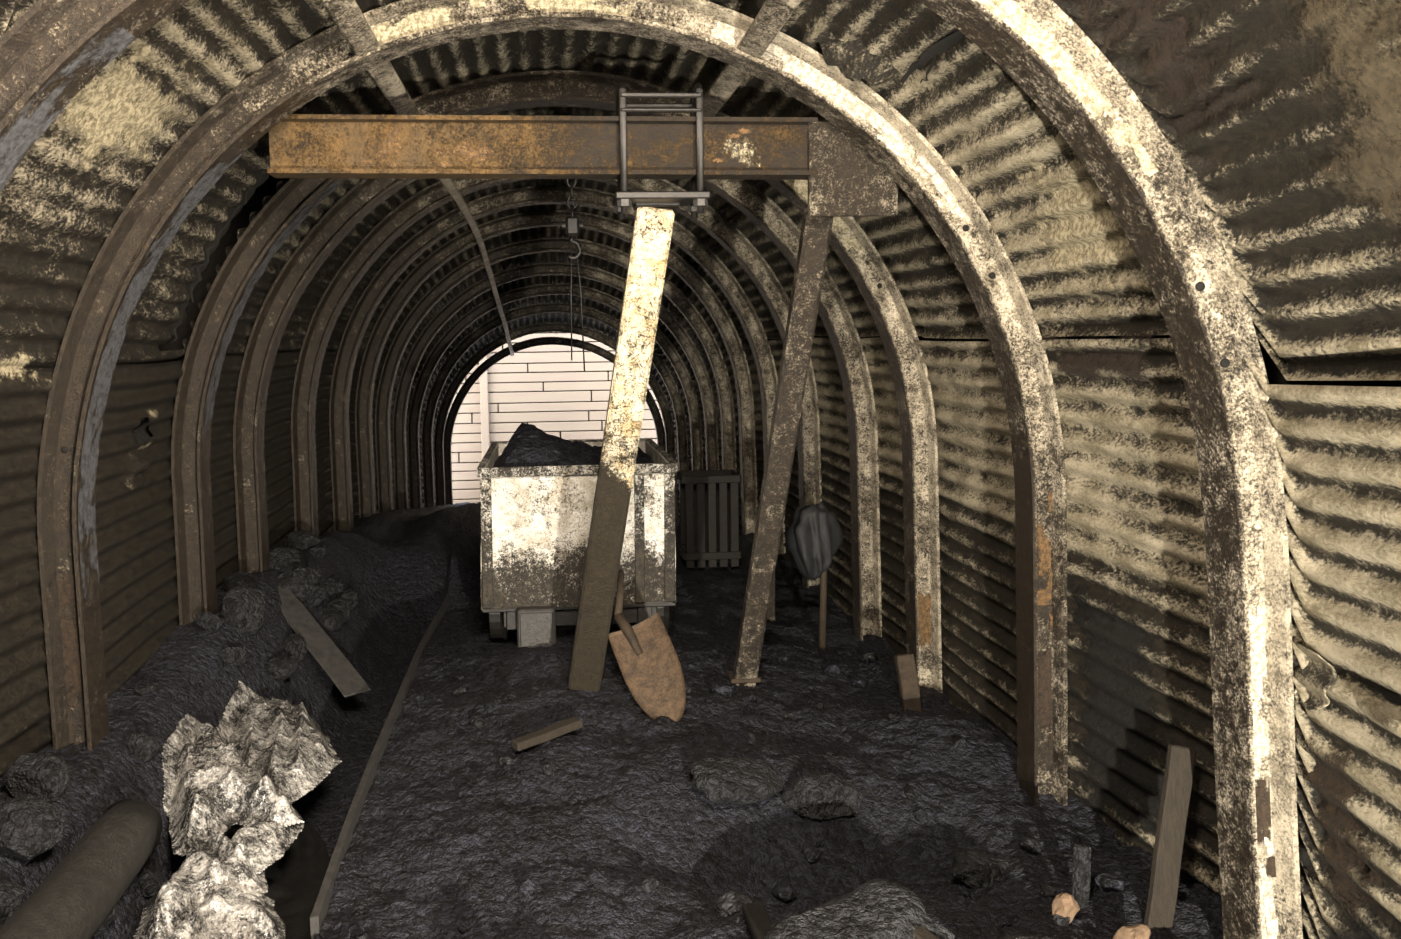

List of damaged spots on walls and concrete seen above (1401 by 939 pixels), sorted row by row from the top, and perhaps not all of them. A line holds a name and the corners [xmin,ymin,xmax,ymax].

corrosion [436,137,502,168]
corrosion [1037,492,1053,628]